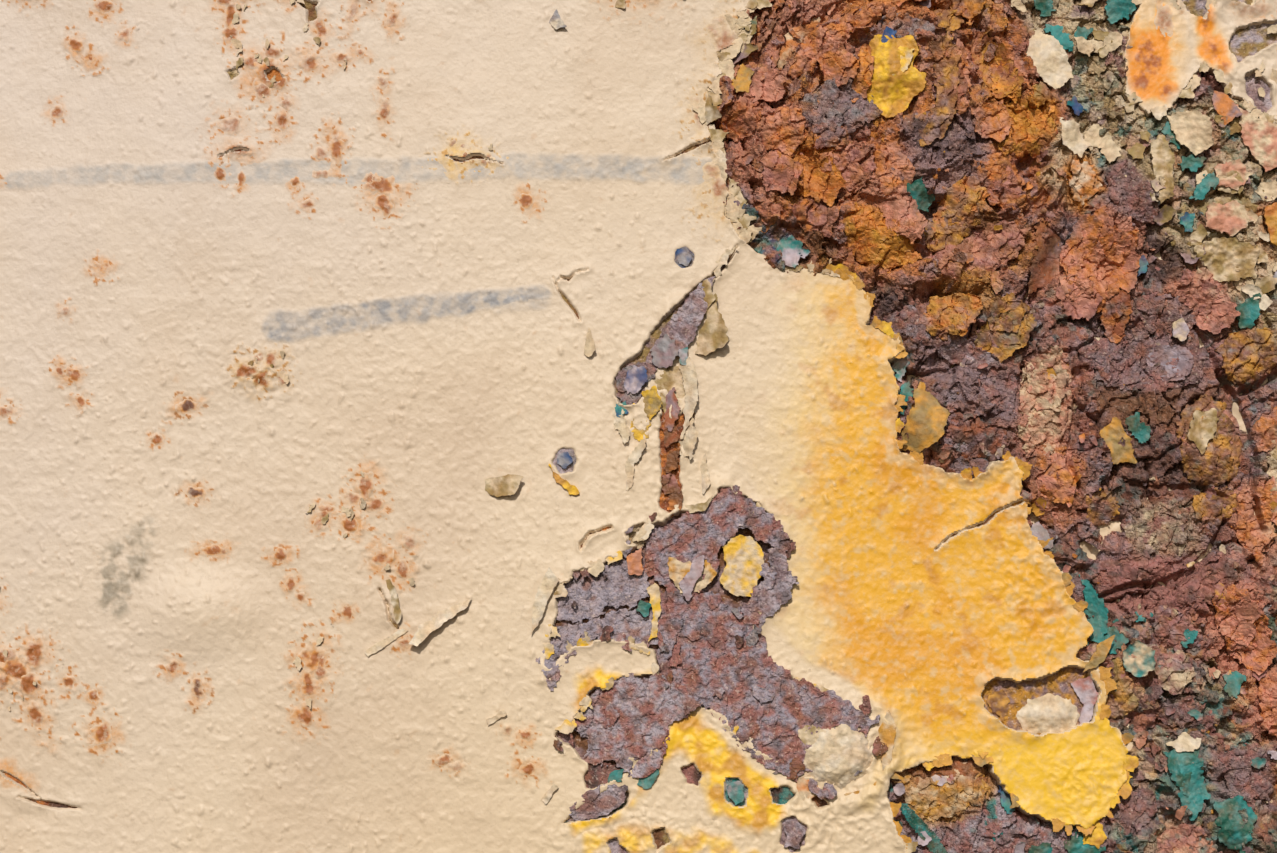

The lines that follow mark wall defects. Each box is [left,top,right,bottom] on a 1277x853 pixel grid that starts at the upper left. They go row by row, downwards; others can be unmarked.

peeling [1170,0,1217,17]
rust [193,0,422,231]
rust [418,123,509,187]
rust [504,179,551,228]
peeling [1229,22,1277,123]
rust [588,0,1277,853]
peeling [531,245,896,853]
crack [936,499,1032,549]
rust [0,574,134,770]
peeling [982,635,1115,735]